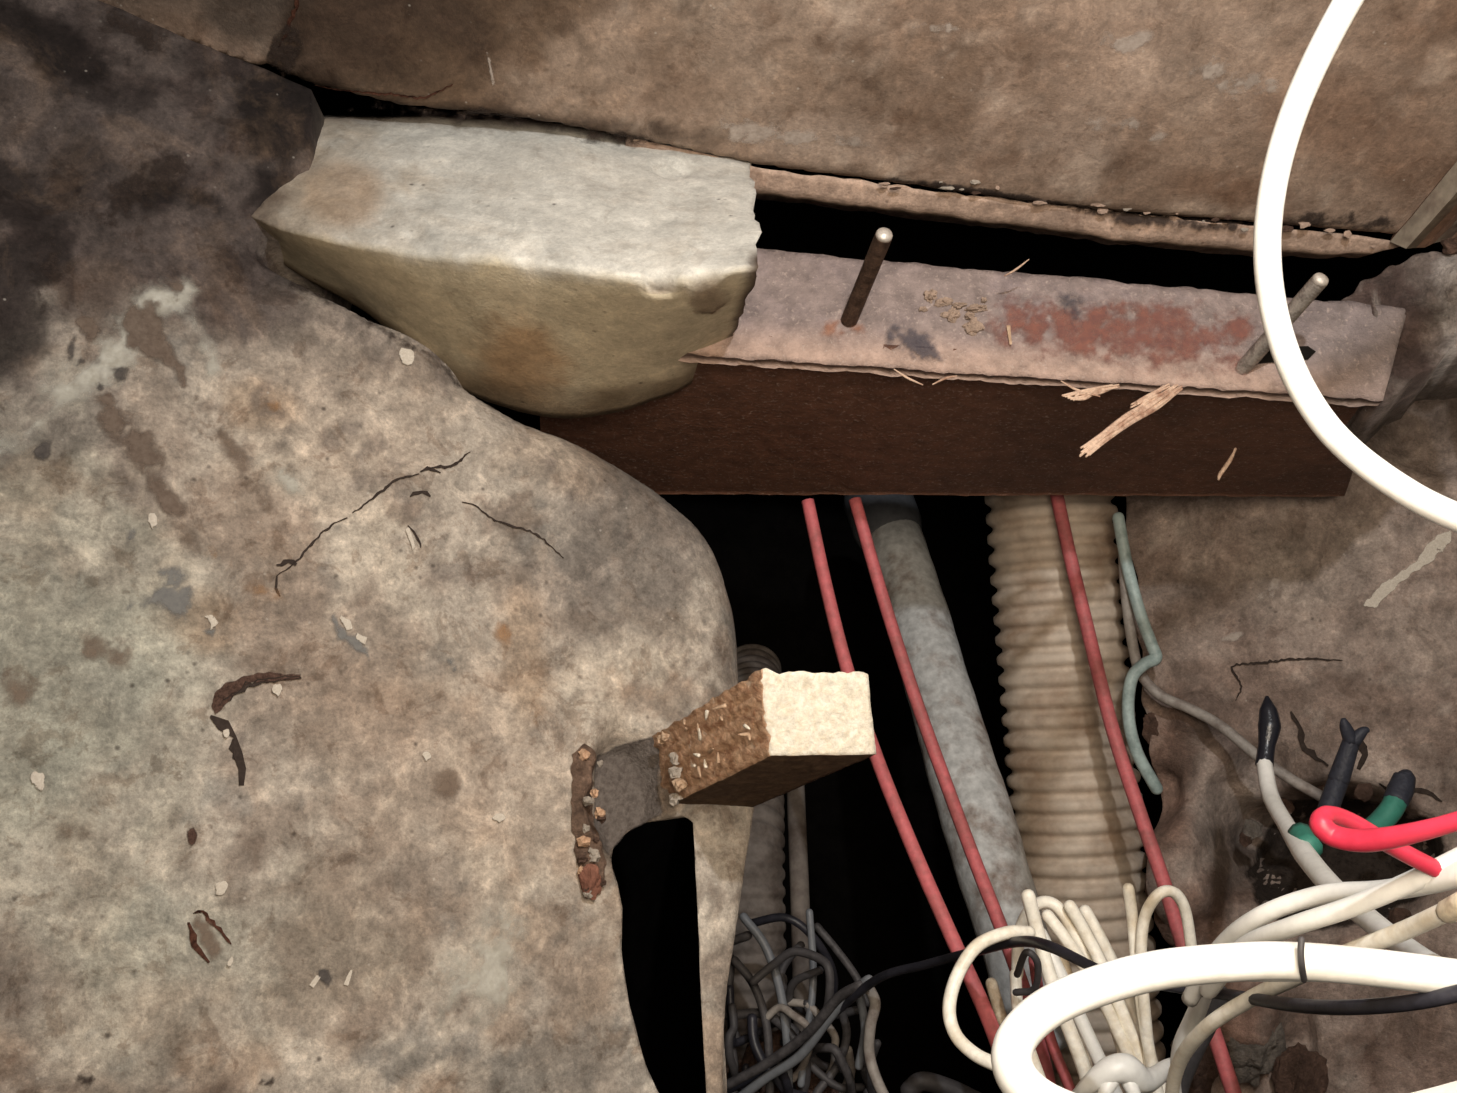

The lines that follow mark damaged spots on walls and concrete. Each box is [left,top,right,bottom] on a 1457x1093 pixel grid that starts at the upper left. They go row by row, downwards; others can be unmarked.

crack [267,0,453,100]
peeling [879,177,1249,232]
peeling [1282,222,1352,239]
rust [995,303,1252,367]
water stain [45,282,197,541]
crack [275,452,564,596]